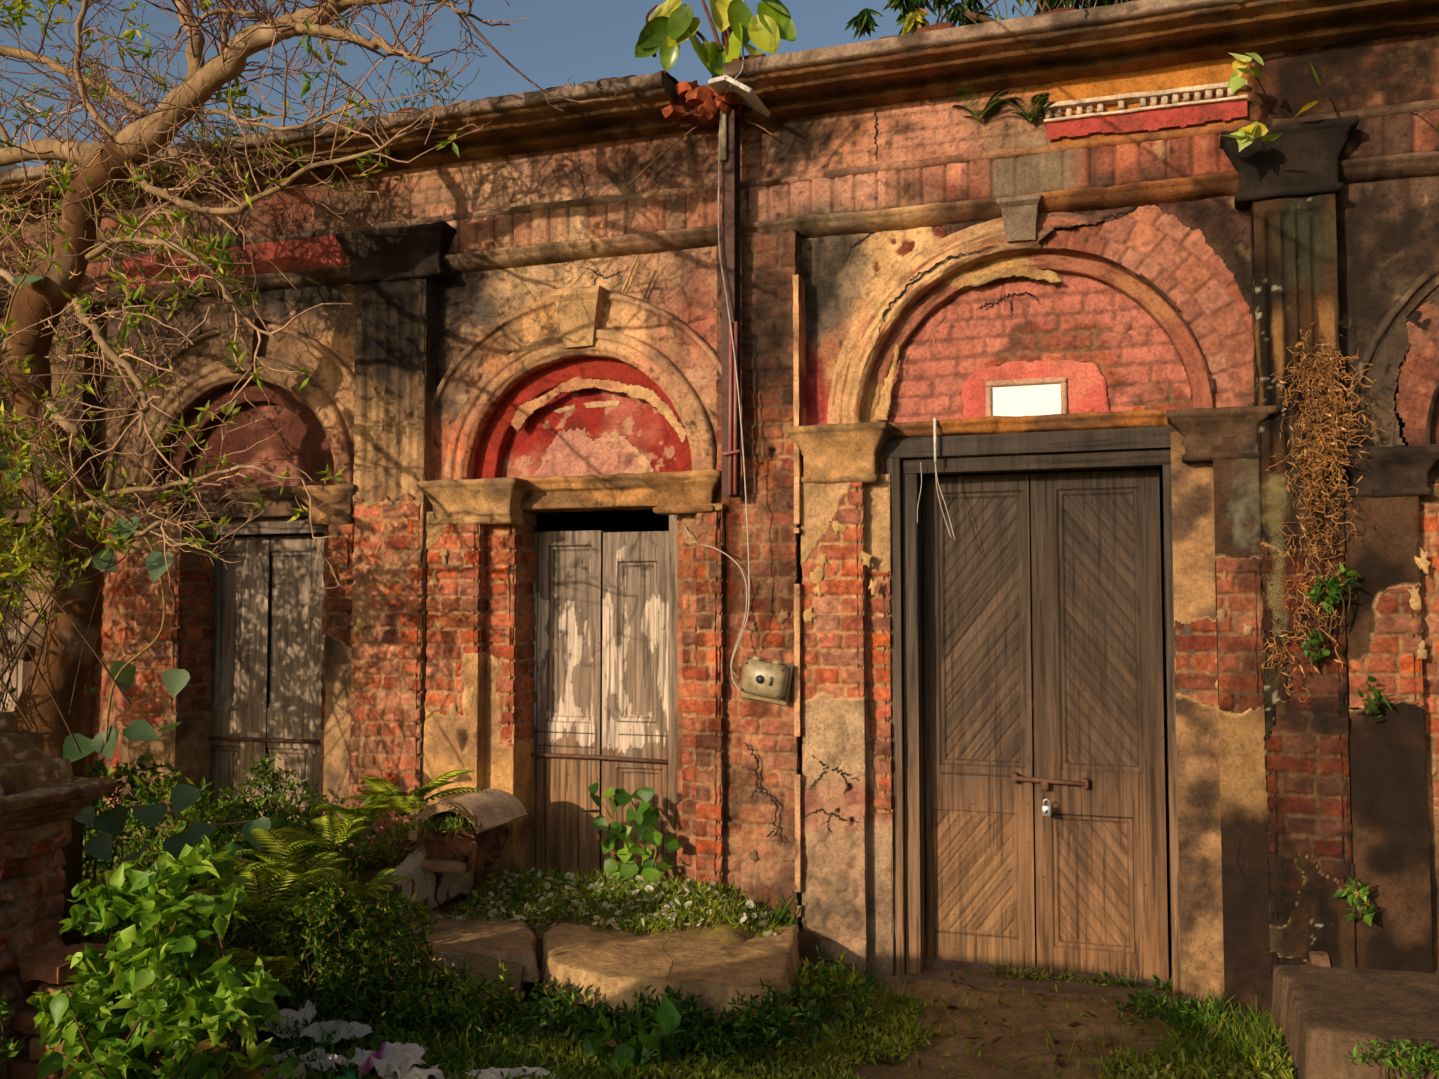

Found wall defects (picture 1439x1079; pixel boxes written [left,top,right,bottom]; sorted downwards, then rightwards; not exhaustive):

peeling [533,428,654,477]
peeling [511,376,686,443]
leakage [555,139,700,188]
flaking render [892,239,915,256]
flaking render [933,226,949,238]
flaking render [873,264,1193,422]
flaking render [1038,204,1255,408]
flaking render [682,228,894,925]
flaking render [326,493,537,861]
flaking render [1175,502,1439,927]